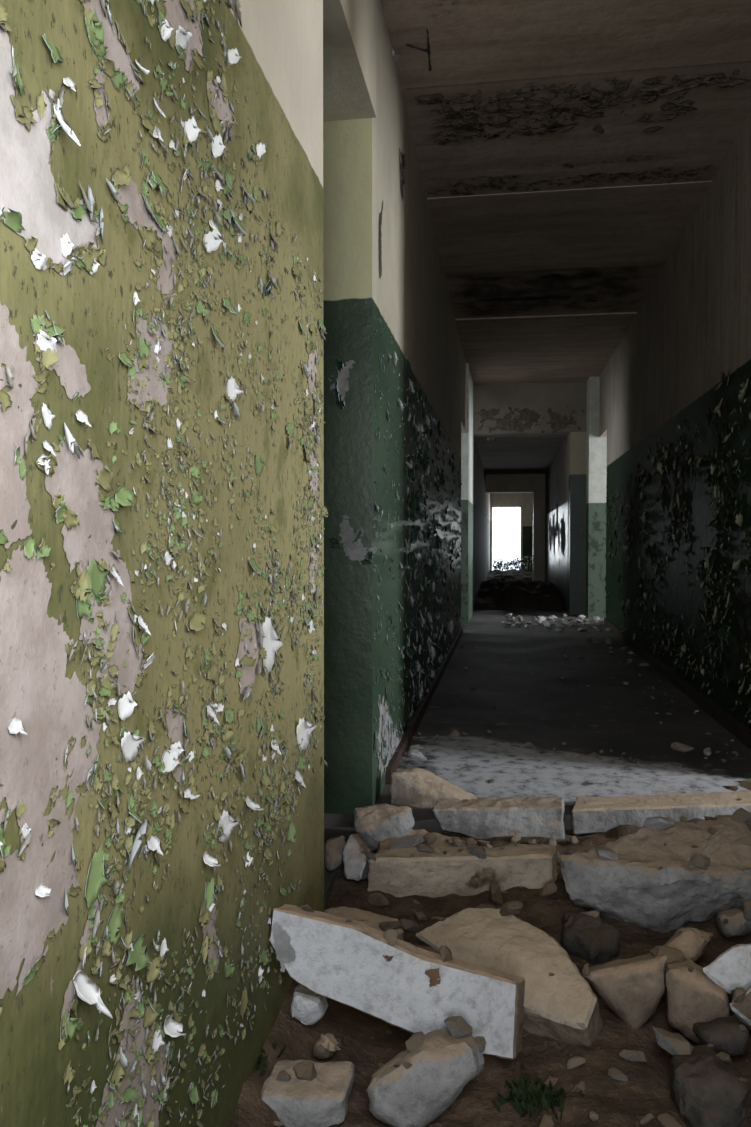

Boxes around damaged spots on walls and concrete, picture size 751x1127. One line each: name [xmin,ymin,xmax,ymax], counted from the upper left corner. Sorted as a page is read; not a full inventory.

peeling [0,0,462,1127]
peeling [475,404,585,441]
peeling [604,379,751,695]